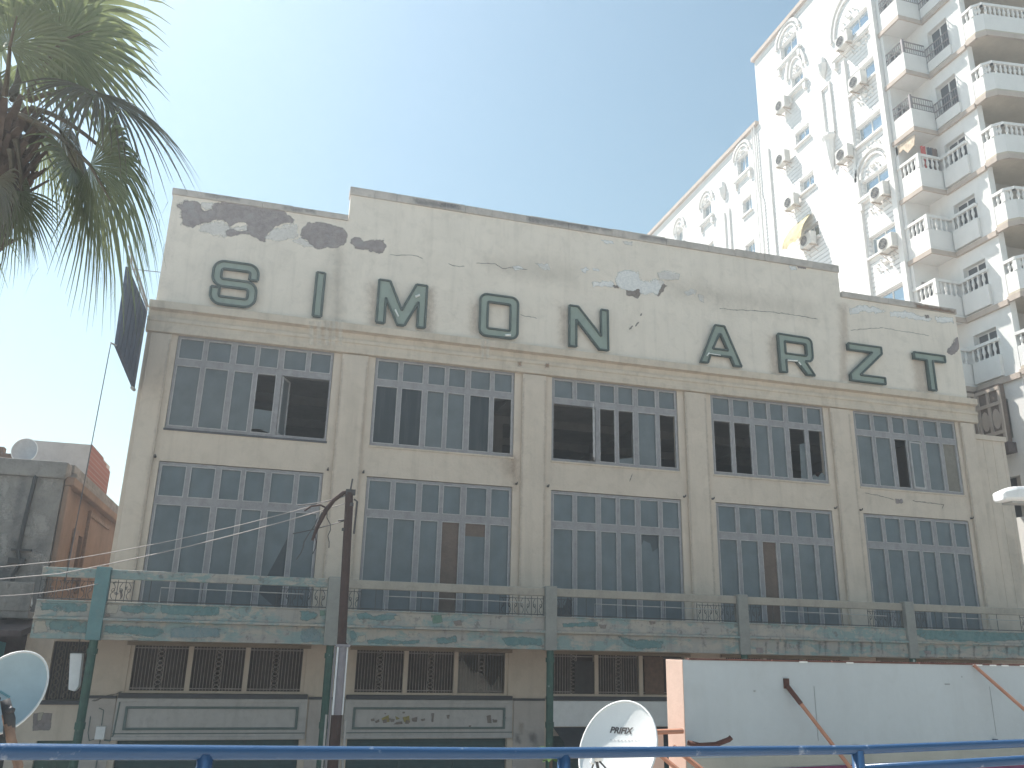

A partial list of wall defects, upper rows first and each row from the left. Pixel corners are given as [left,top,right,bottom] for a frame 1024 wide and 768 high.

spalling [177,201,386,254]
peeling [592,270,680,299]
peeling [33,602,87,633]
peeling [103,581,219,639]